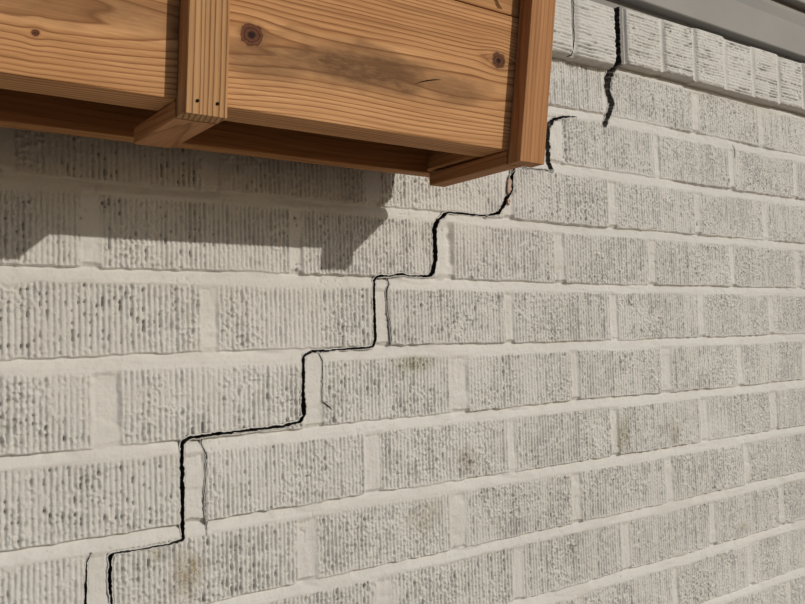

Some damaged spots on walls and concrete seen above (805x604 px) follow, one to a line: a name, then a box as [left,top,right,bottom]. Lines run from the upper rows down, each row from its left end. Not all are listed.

crack [567,0,575,57]
crack [602,68,616,126]
crack [83,115,576,604]